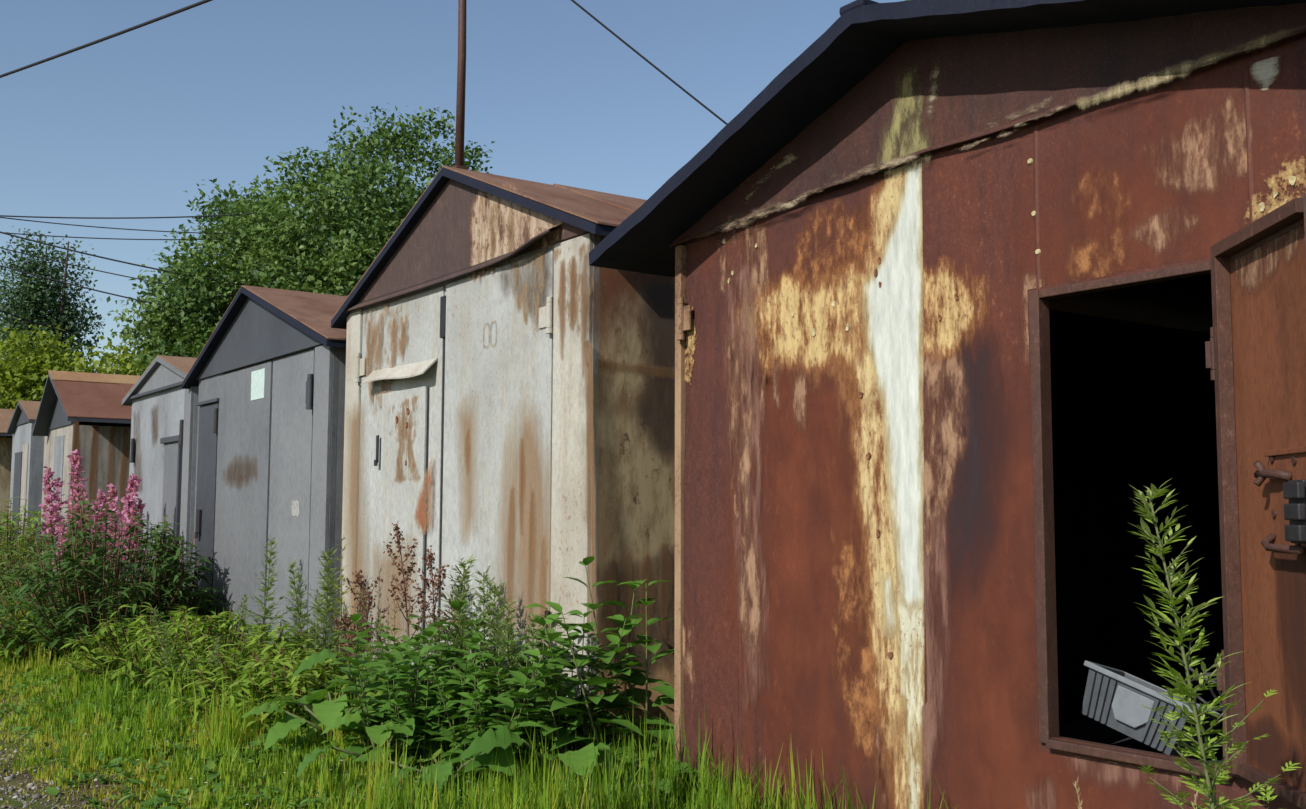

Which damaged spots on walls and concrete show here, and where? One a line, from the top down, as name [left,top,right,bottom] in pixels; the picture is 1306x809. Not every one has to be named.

corrosion [762,192,877,343]
corrosion [1069,173,1199,280]
corrosion [1157,98,1252,193]
peeling [1244,156,1306,225]
leakage [638,280,675,456]
corrosion [395,397,433,533]
corrosion [462,411,472,531]
corrosion [502,420,551,643]
corrosion [735,312,895,809]
peeling [712,155,985,809]
corrosion [920,286,966,807]
corrosion [1246,553,1306,787]